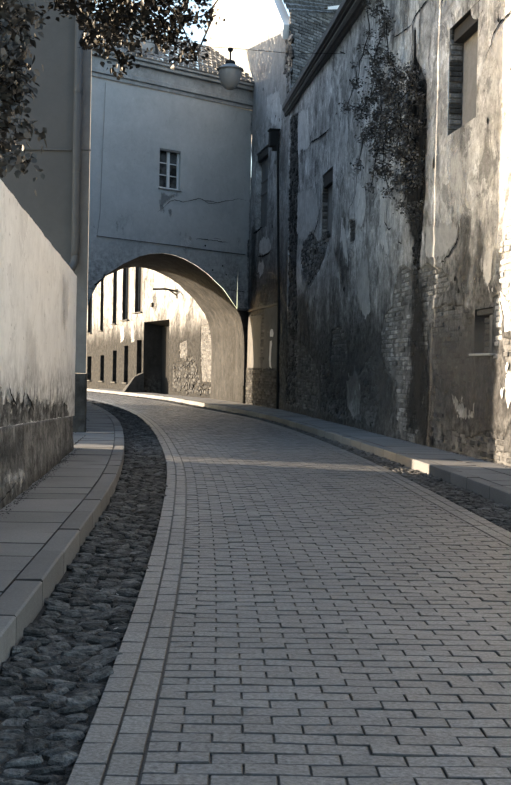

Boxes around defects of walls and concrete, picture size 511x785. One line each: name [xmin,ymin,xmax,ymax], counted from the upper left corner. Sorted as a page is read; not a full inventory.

crack [394,0,443,52]
spalling [411,0,434,188]
crack [487,10,511,53]
peeling [493,15,511,133]
spalling [266,31,330,407]
peeling [340,176,366,267]
peeling [357,249,371,319]
spalling [381,185,511,466]
leakage [403,55,502,448]